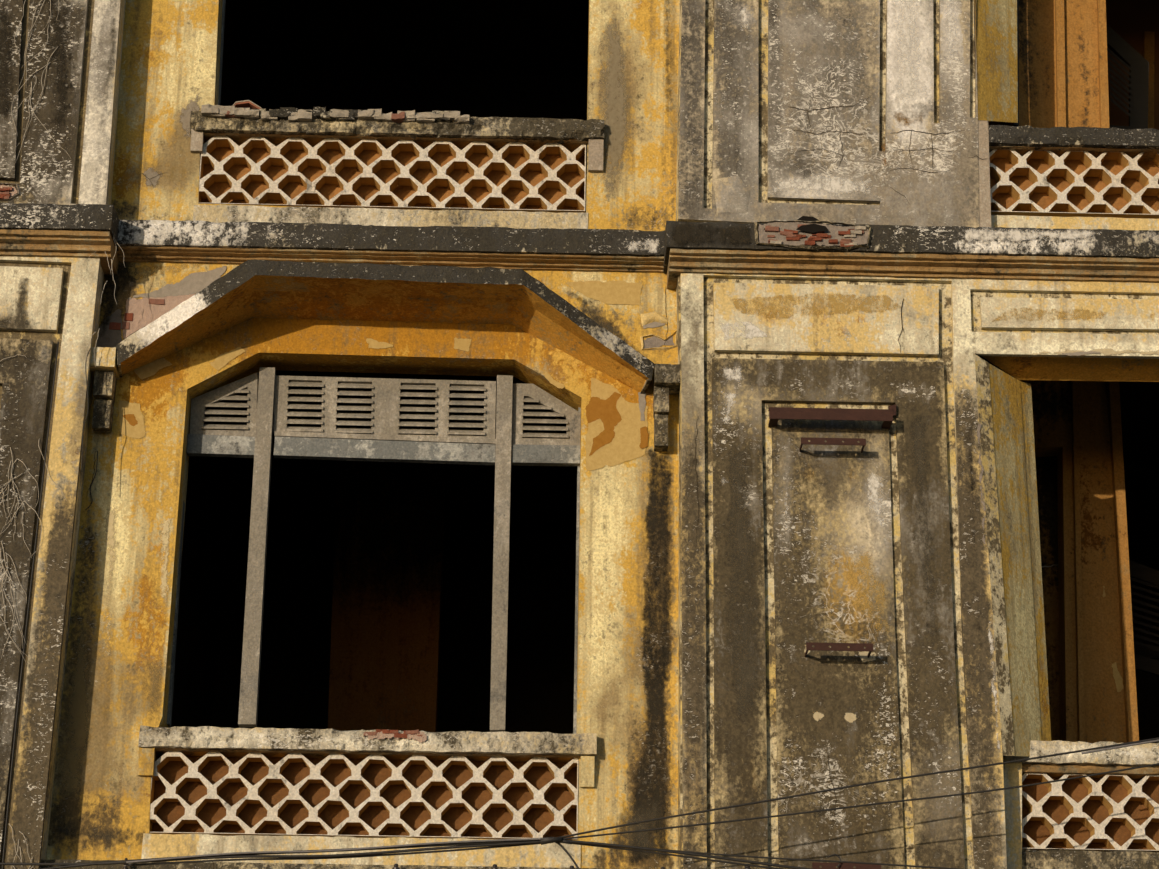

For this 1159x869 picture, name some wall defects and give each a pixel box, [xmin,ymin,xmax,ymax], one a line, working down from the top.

damp [0,9,13,115]
damp [46,0,72,124]
damp [600,18,627,197]
spalling [754,216,872,249]
damp [0,279,29,328]
spalling [97,263,227,348]
peeling [566,280,642,305]
peeling [585,378,649,471]
efflorescence [868,473,883,524]
damp [610,450,672,865]
damp [60,622,89,796]
spalling [364,729,427,743]